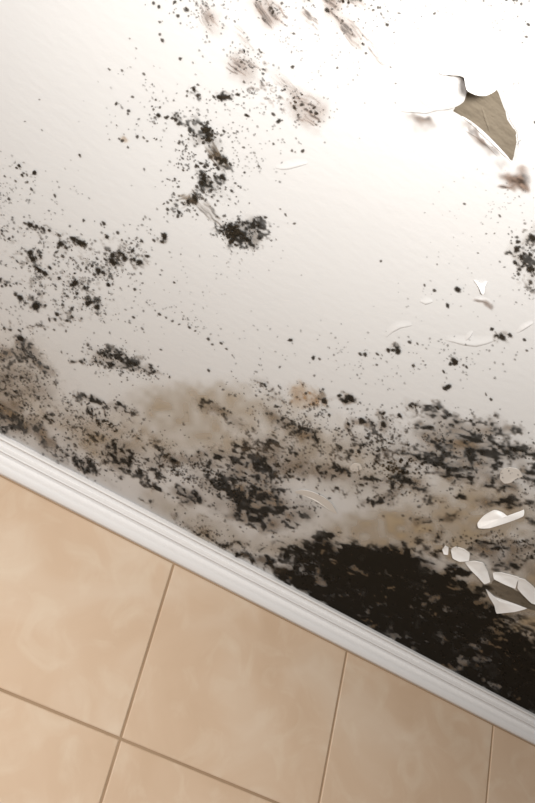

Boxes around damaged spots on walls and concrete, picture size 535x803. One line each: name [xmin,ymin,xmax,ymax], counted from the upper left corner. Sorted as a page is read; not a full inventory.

water stain [186,84,240,104]
peeling [401,56,521,162]
water stain [151,99,272,252]
water stain [500,173,529,191]
water stain [0,219,535,714]
peeling [477,510,524,529]
peeling [442,546,535,614]